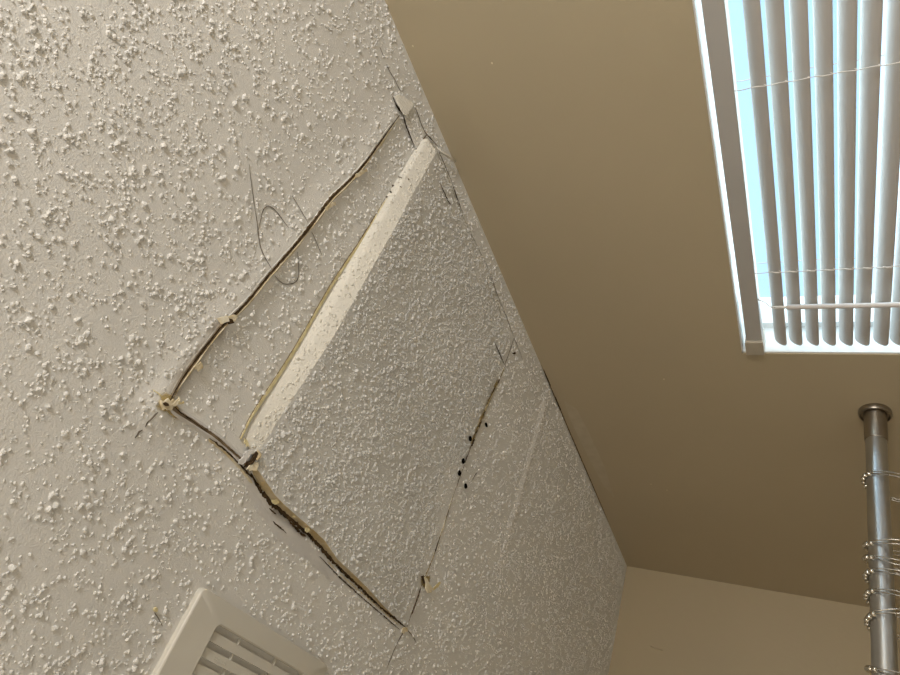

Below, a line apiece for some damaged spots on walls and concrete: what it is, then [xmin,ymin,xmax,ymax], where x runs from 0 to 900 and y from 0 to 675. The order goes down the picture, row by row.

crack [135,108,607,667]